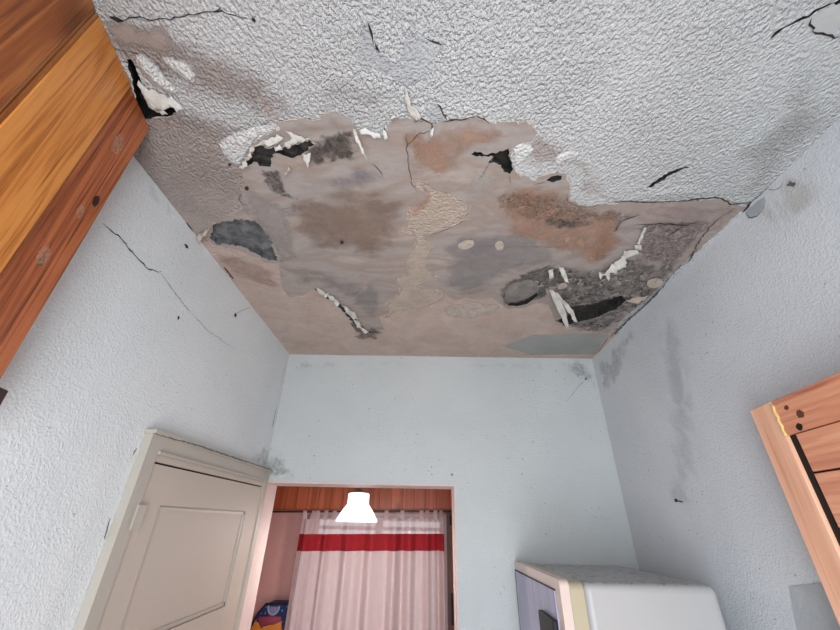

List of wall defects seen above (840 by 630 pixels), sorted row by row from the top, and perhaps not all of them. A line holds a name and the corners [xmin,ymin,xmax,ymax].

crack [105,6,253,22]
crack [770,0,840,40]
spalling [127,59,184,119]
crack [105,225,222,341]
leakage [134,113,618,359]
peeling [184,20,796,355]
crack [567,167,768,352]